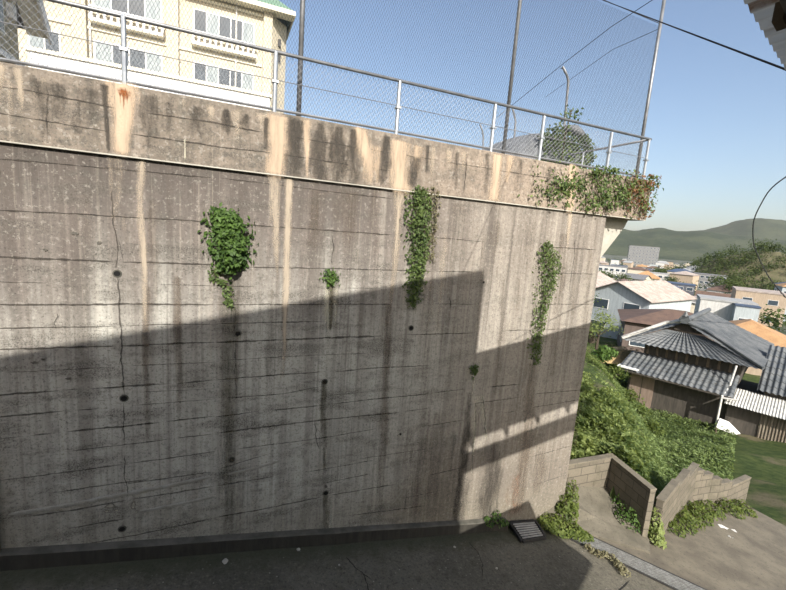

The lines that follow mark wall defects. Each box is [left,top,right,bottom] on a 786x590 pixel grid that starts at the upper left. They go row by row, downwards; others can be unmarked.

crack [111,192,128,499]
leakage [105,81,137,155]
leakage [138,160,149,372]
leakage [259,114,292,359]